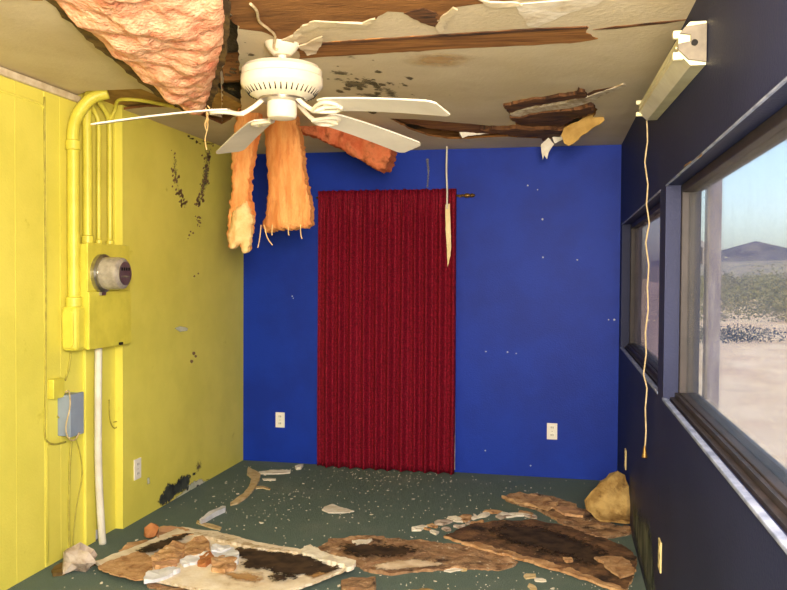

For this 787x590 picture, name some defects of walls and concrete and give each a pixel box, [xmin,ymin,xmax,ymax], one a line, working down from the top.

peeling [230,0,602,59]
peeling [175,479,205,499]